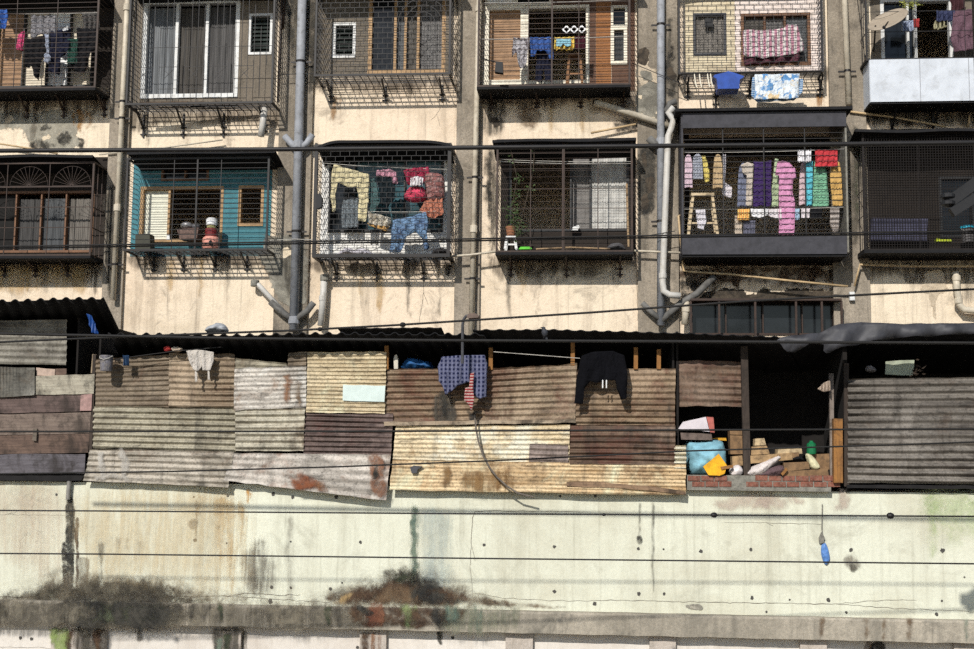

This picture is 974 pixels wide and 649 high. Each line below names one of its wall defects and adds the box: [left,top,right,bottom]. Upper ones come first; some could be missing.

rust [292,475,324,491]
rust [368,454,386,497]
damp [0,497,518,649]
damp [866,623,885,649]